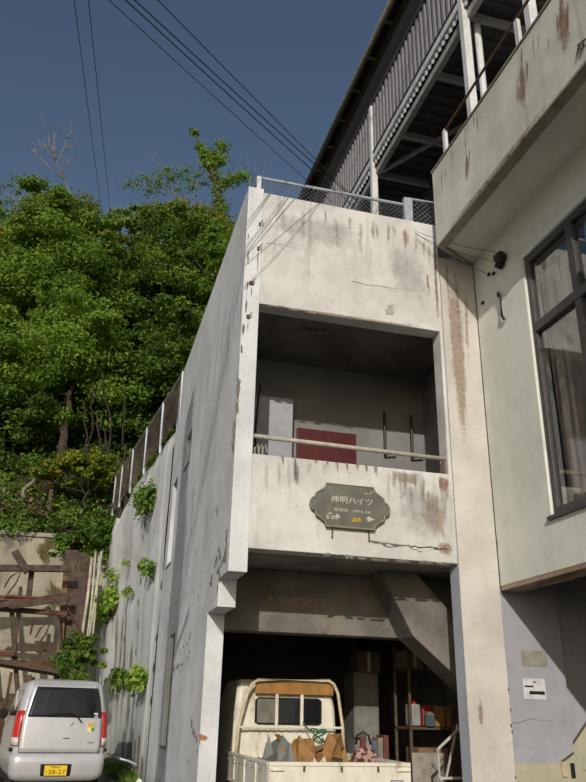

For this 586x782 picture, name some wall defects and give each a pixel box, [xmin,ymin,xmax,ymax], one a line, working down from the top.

corrosion [557,0,569,47]
corrosion [517,50,528,99]
spalling [231,375,241,452]
peeling [209,529,228,592]
crack [369,541,448,552]